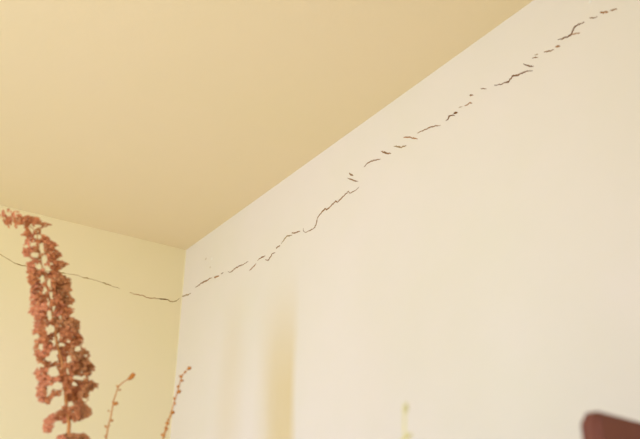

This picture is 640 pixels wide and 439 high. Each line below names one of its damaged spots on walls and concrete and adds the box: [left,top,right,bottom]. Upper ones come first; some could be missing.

crack [0,8,616,302]